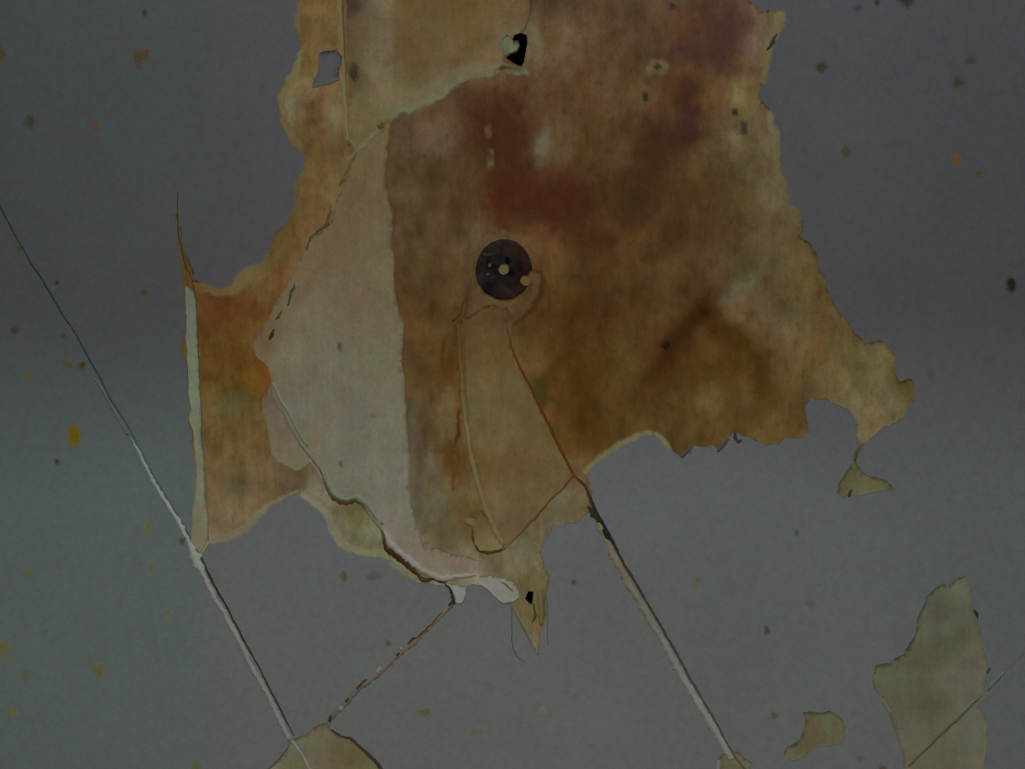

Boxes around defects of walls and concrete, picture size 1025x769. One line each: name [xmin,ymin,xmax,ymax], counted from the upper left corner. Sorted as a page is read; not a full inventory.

crack [0,192,295,741]
peeling [266,723,383,769]
crack [270,383,455,727]
peeling [175,0,915,654]
crack [506,325,746,769]
peeling [784,711,845,761]
peeling [872,576,991,769]